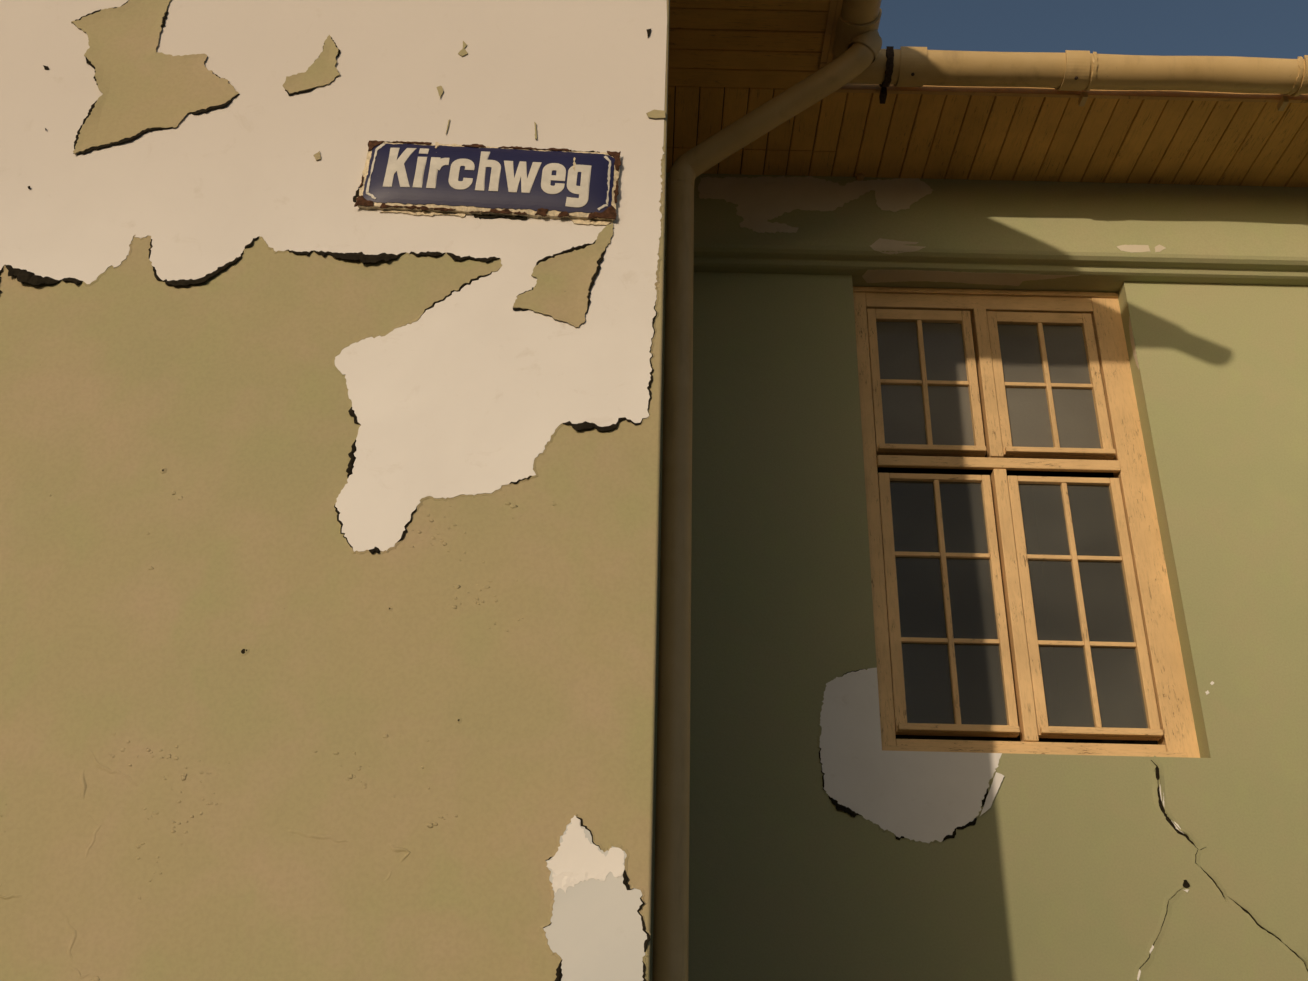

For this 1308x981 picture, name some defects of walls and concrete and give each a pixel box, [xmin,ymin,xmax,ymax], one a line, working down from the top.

peeling [0,0,667,554]
peeling [540,813,651,981]
peeling [817,667,1004,846]
crack [1132,756,1308,981]